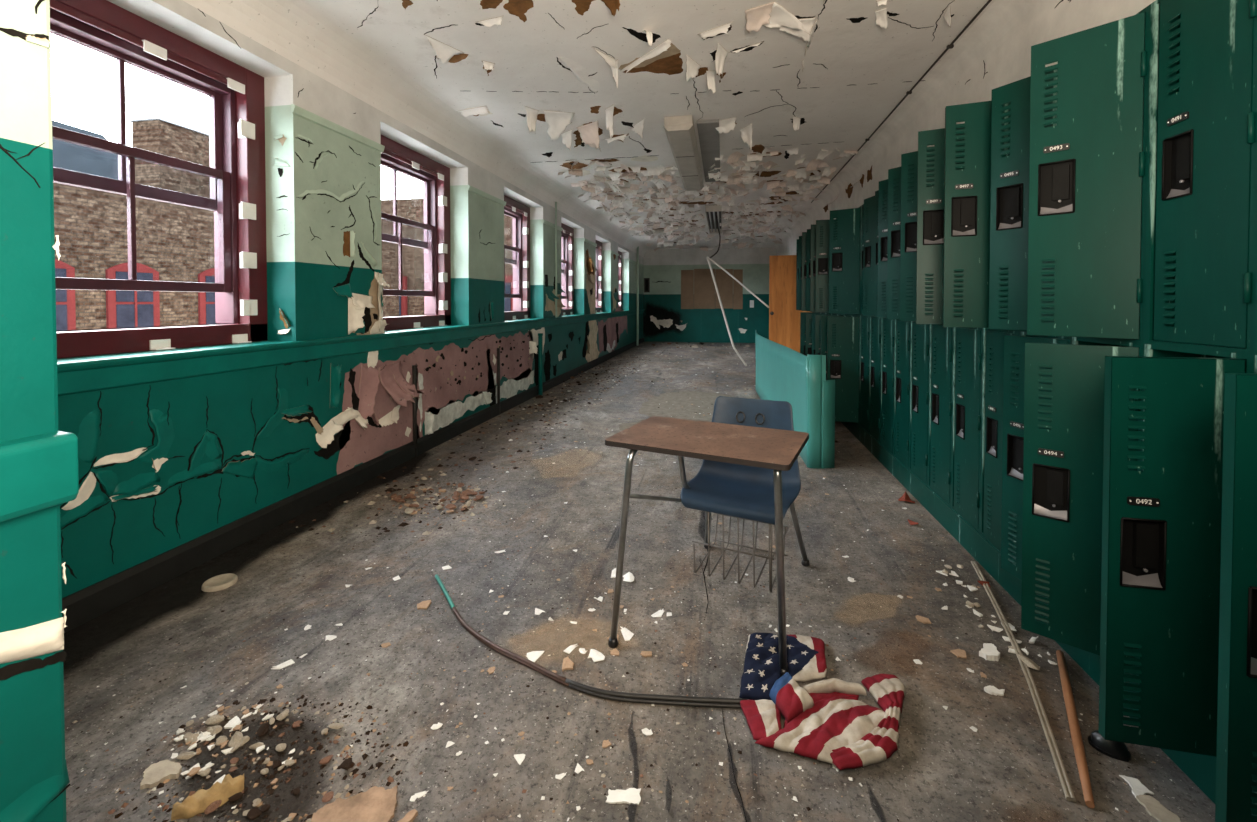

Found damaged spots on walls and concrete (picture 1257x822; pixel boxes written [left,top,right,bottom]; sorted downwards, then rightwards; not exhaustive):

spalling [475,0,534,27]
peeling [572,0,827,94]
crack [888,0,955,41]
crack [672,80,849,119]
crack [0,143,44,188]
crack [295,134,379,269]
peeling [518,90,872,251]
crack [742,135,822,159]
peeling [333,231,390,335]
spalling [281,249,628,475]
peeling [110,458,174,503]
crack [60,359,322,579]